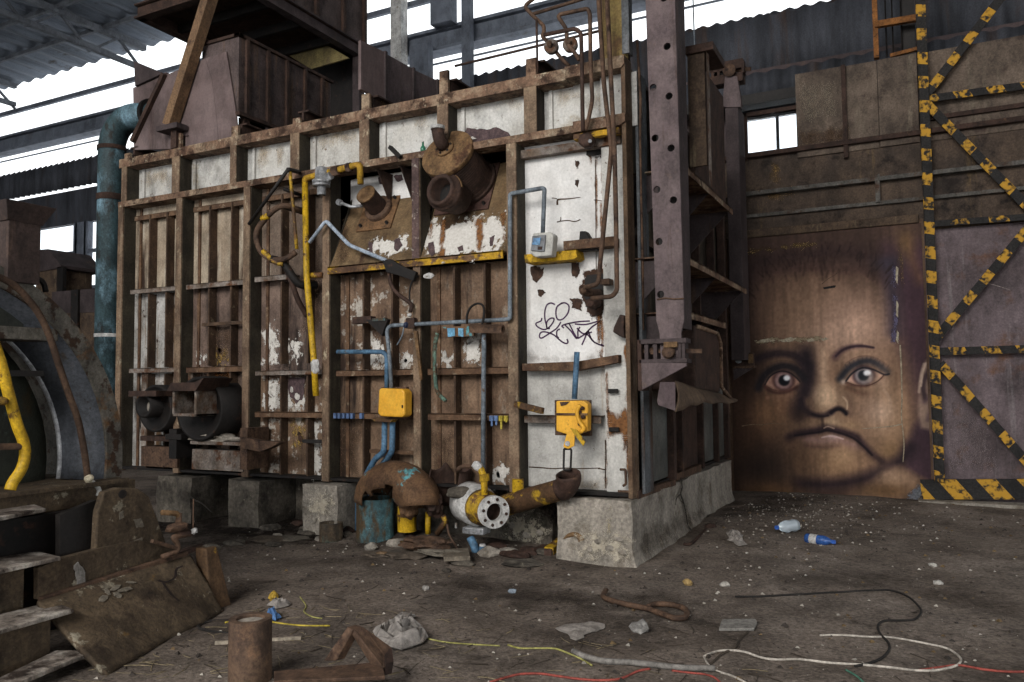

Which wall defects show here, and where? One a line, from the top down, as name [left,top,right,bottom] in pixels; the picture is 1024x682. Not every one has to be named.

peeling [368,234,409,258]
peeling [424,210,507,263]
peeling [370,338,384,367]
peeling [261,328,322,482]
corrosion [605,373,628,471]